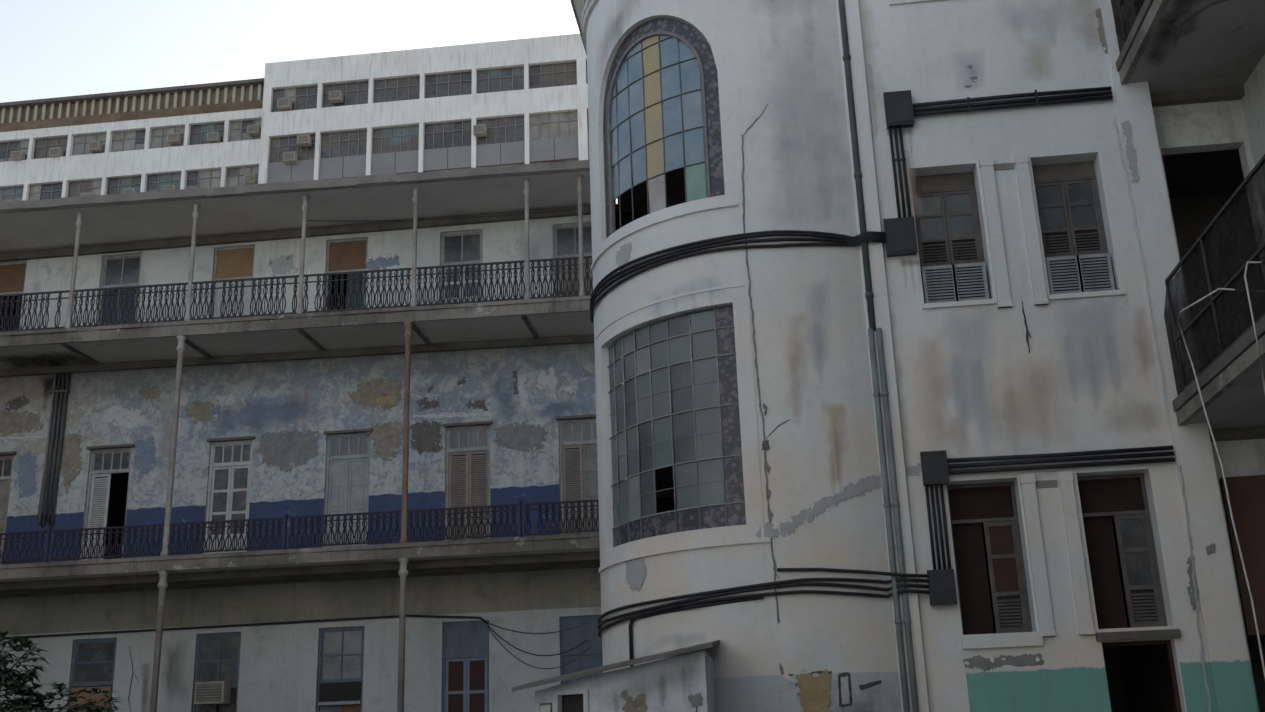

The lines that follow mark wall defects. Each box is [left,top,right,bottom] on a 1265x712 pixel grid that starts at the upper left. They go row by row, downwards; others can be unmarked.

crack [1022,301,1031,353]
crack [741,104,791,624]
peeling [349,366,581,462]
peeling [255,424,323,472]
flaking render [761,440,775,521]
flaking render [621,690,648,712]
flaking render [789,669,838,712]